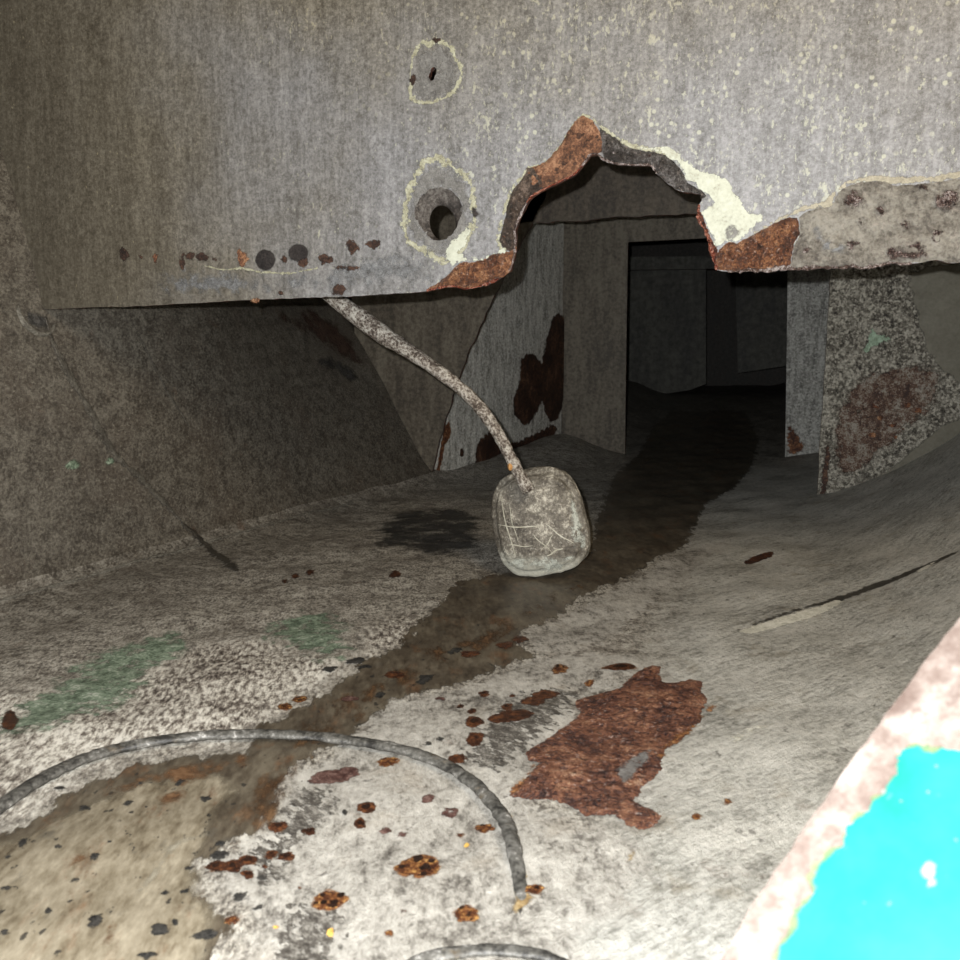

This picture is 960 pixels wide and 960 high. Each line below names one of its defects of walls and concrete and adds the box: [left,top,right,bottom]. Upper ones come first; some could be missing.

peeling [445,113,960,266]
rust [460,432,501,463]
rust [510,313,565,449]
rust [820,365,939,494]
leakage [0,410,759,960]
rust [509,663,716,830]